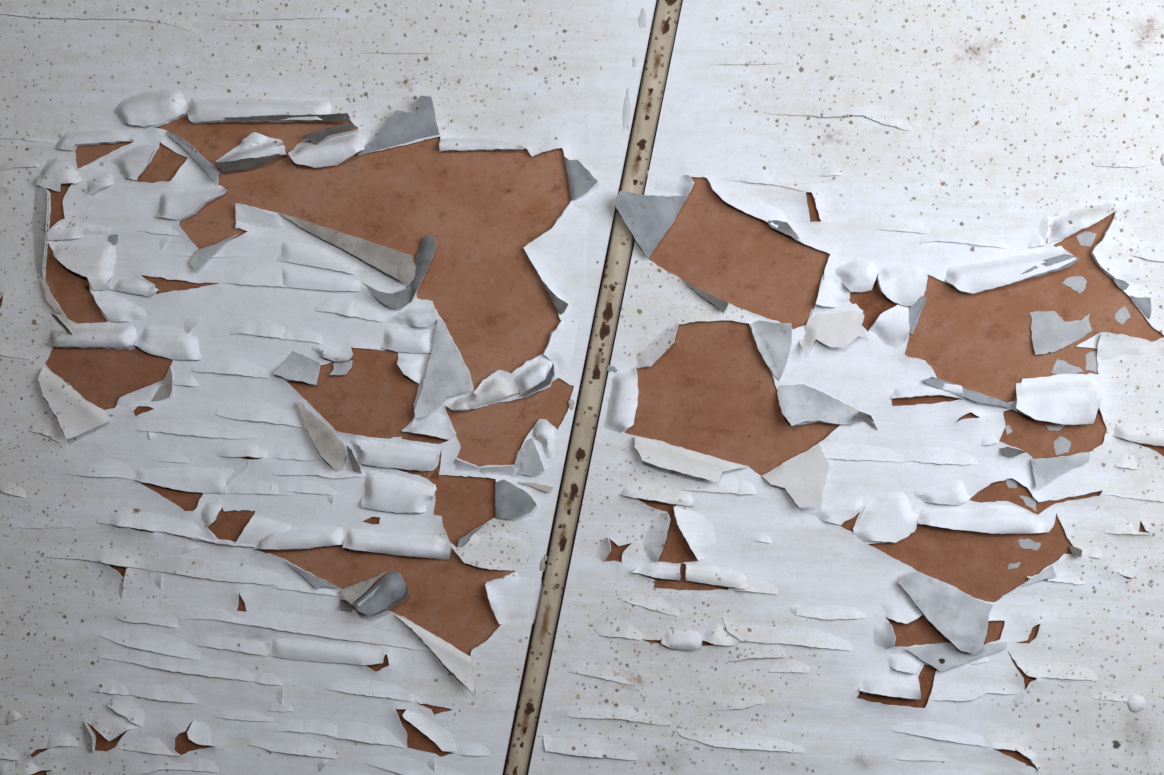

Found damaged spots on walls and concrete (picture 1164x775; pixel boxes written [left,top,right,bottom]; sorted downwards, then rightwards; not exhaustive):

corrosion [645,0,677,120]
corrosion [633,139,647,185]
corrosion [592,285,616,380]
peeling [32,88,598,692]
peeling [594,171,1164,708]
corrosion [558,483,578,551]
peeling [0,748,76,775]
peeling [82,712,139,753]
peeling [174,720,216,755]
peeling [396,702,457,757]
corrosion [520,703,535,748]